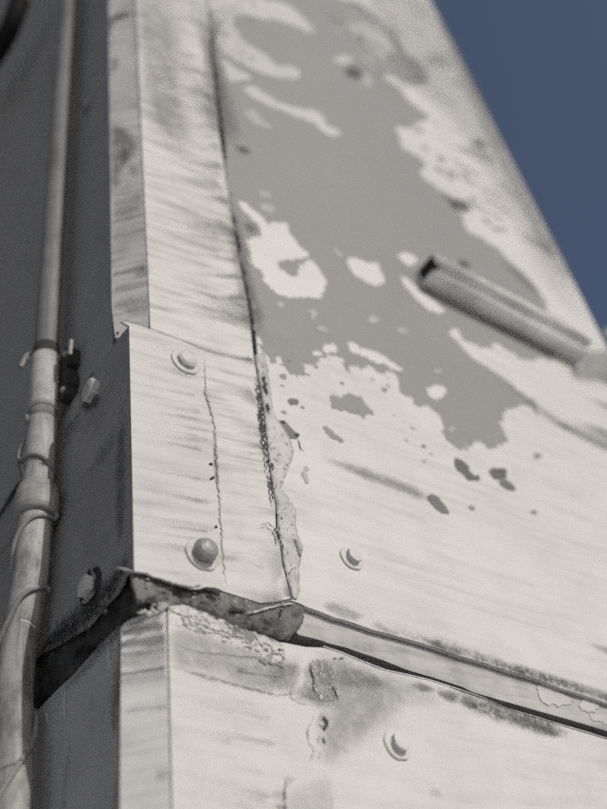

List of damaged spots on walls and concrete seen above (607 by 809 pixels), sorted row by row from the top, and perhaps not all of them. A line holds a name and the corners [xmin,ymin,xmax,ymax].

peeling [206,0,556,481]
peeling [427,494,450,515]
peeling [489,467,516,491]
spalling [126,602,294,668]
crack [176,624,343,761]